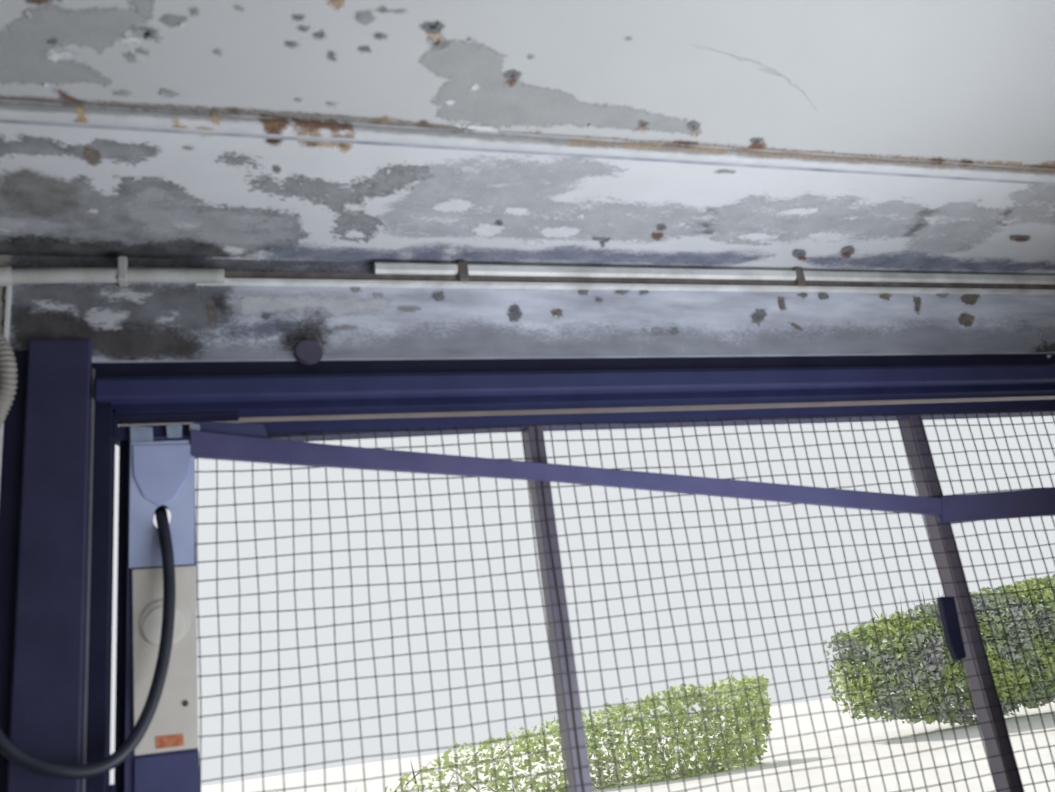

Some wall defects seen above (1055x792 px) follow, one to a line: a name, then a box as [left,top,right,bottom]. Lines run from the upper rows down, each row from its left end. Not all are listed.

peeling [0,0,199,97]
spalling [293,16,325,40]
spalling [355,7,406,25]
peeling [372,22,702,137]
damp [83,148,102,165]
rust [0,90,1055,175]
peeling [0,134,1055,261]
damp [0,234,761,273]
damp [808,253,1055,272]
damp [9,283,333,361]